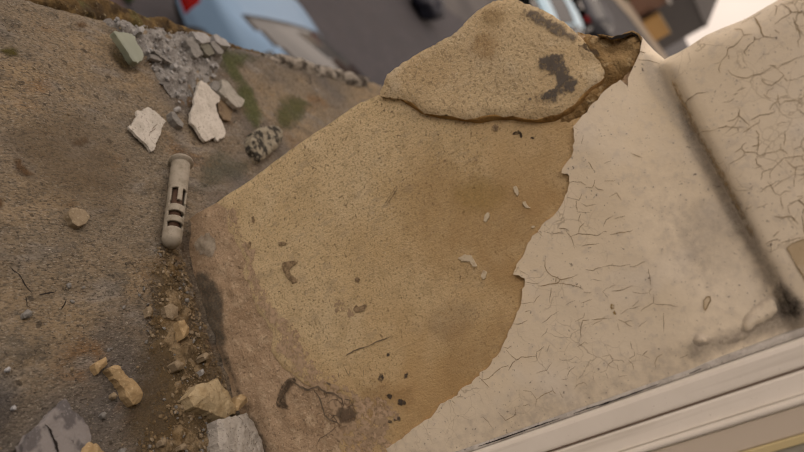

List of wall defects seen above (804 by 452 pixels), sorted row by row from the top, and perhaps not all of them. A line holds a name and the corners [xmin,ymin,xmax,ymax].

spalling [25,0,370,88]
peeling [127,79,244,153]
crack [702,4,804,252]
spalling [63,208,90,229]
peeling [189,31,642,452]
crack [538,127,632,246]
peeling [787,239,804,278]
water stain [197,273,231,371]
crack [480,258,677,446]